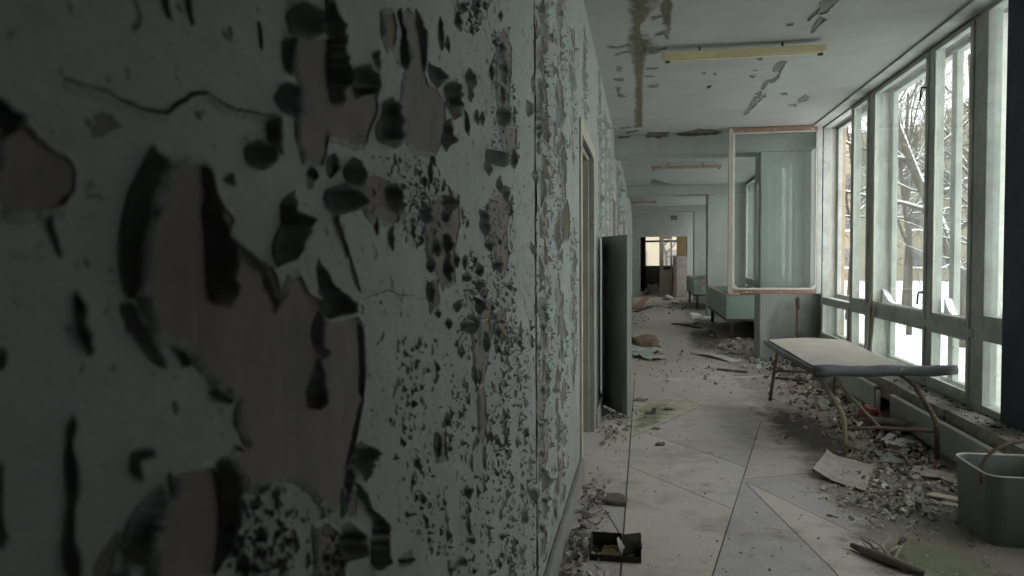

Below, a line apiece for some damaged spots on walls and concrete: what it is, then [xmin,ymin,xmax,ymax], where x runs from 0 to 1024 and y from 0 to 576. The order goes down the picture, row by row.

spalling [808,0,840,34]
crack [59,68,283,124]
spalling [743,57,810,115]
peeling [0,98,82,258]
peeling [109,0,725,576]
peeling [74,291,96,356]
peeling [0,346,9,371]
peeling [0,462,11,551]
peeling [63,414,83,576]